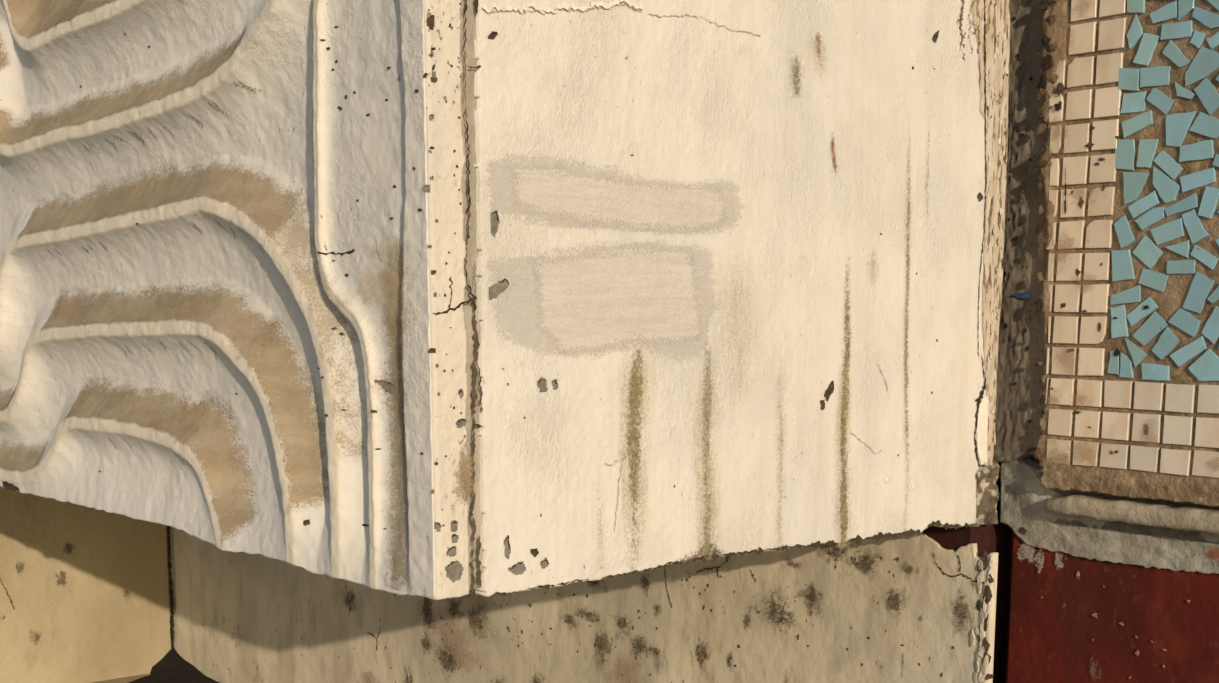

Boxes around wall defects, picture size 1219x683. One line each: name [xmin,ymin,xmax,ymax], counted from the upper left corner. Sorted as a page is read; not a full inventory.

crack [433,0,761,595]
peeling [958,0,1064,528]
leakage [422,599,484,673]
spalling [504,535,549,575]
leakage [548,580,659,659]
leakage [628,350,650,591]
leakage [703,359,712,560]
leakage [743,584,822,647]
leakage [824,277,913,573]